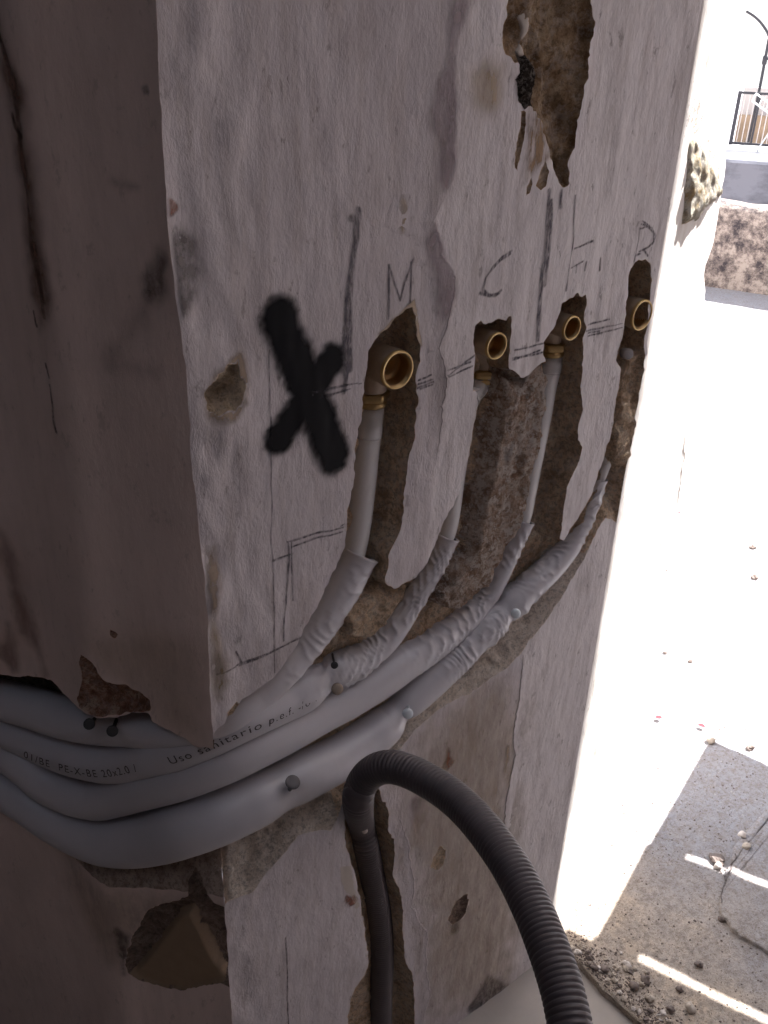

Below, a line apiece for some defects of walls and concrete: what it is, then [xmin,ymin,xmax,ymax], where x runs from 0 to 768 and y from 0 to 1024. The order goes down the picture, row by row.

flaking render [502,0,595,195]
spalling [204,353,248,421]
flaking render [427,364,548,609]
flaking render [77,655,151,717]
spalling [389,550,588,833]
flaking render [75,791,337,991]